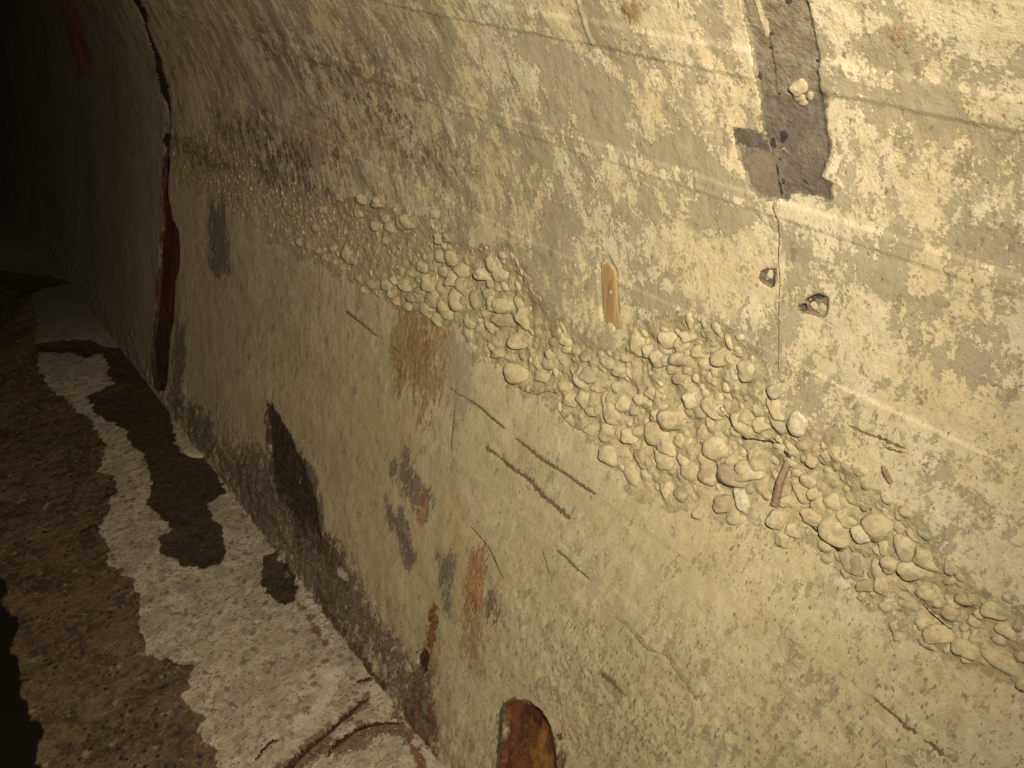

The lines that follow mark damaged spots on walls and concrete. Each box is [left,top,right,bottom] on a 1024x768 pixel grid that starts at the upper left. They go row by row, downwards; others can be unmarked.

corrosion [151,146,187,392]
corrosion [391,310,474,423]
crack [772,202,781,369]
water stain [169,382,436,737]
corrosion [496,697,566,768]
peeling [614,616,698,701]